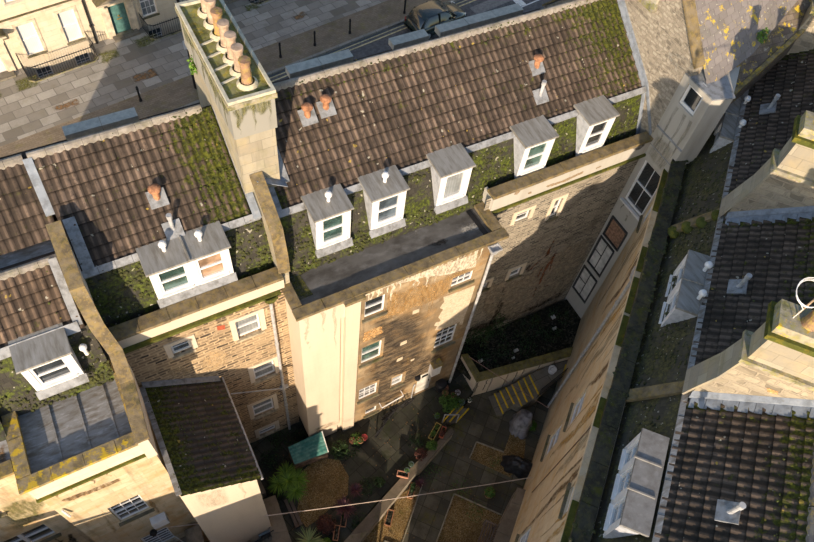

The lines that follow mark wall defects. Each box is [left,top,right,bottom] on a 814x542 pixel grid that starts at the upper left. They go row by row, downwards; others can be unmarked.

peeling [366,248,483,300]